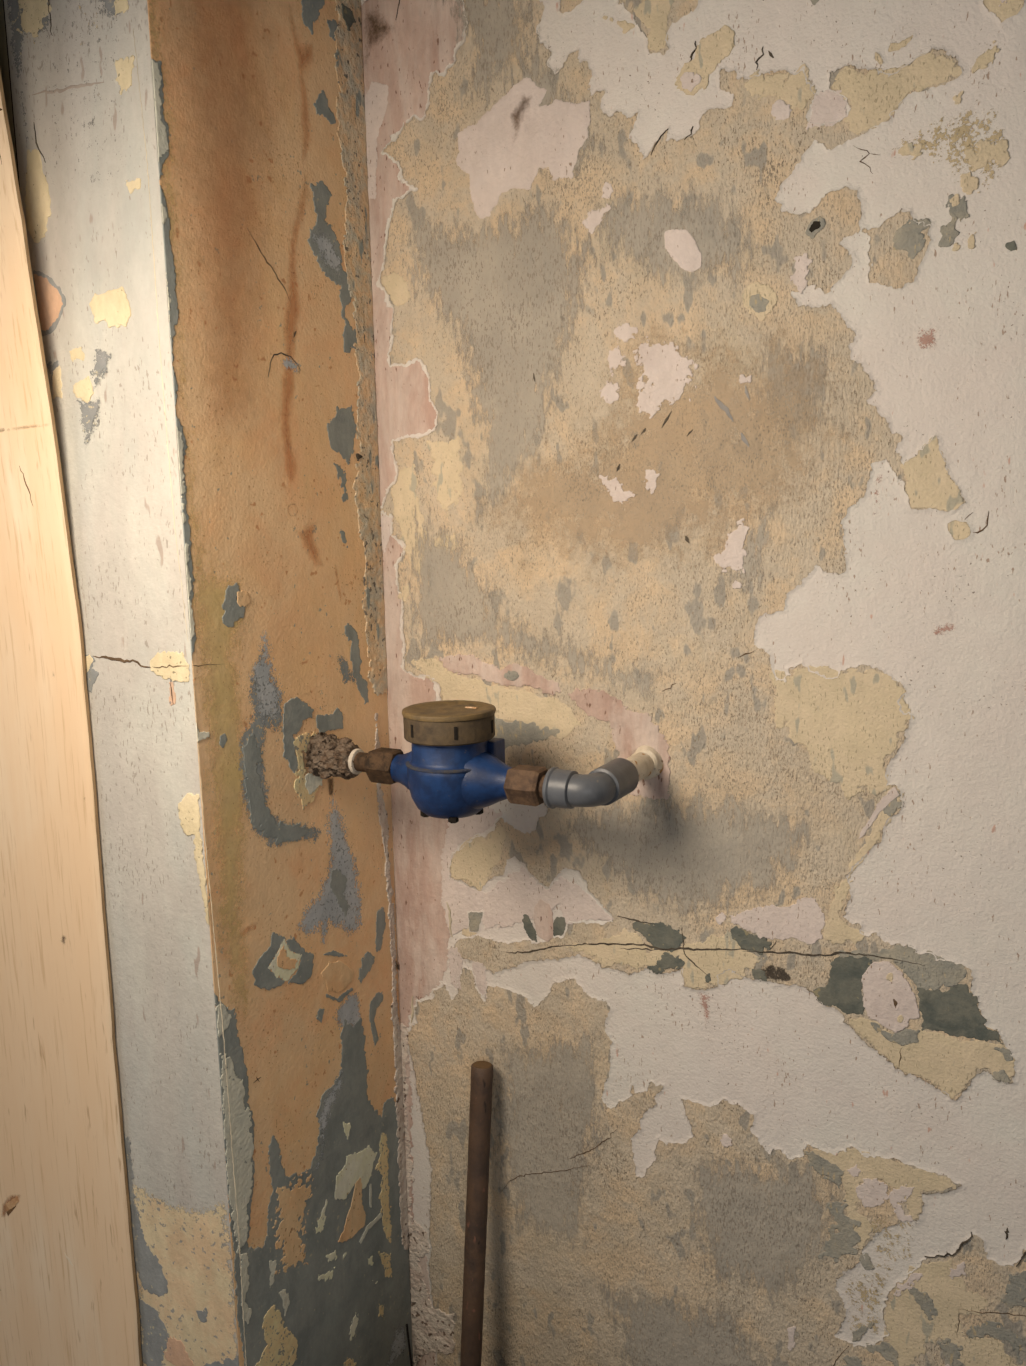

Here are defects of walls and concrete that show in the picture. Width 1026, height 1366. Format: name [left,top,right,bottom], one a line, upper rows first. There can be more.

crack [94,656,220,702]
peeling [7,0,414,1366]
peeling [301,0,1026,1366]
crack [507,916,925,975]